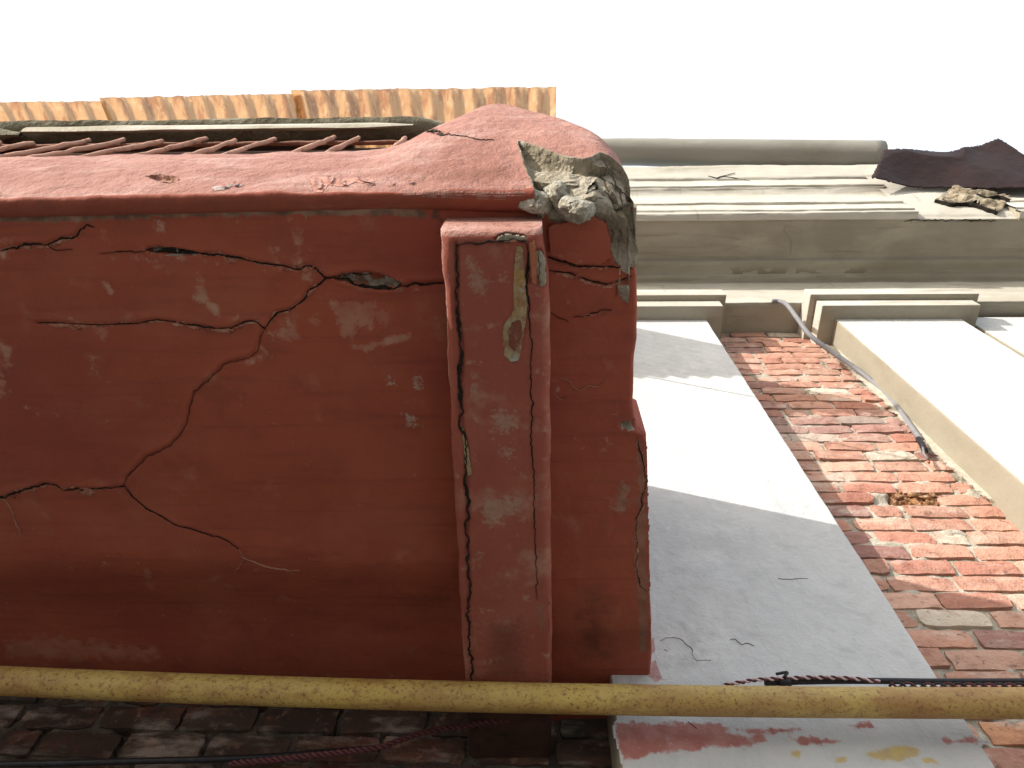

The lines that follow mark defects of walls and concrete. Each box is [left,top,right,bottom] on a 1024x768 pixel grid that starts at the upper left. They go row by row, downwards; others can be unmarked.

crack [426,129,494,141]
crack [1,224,94,251]
spalling [457,149,639,363]
crack [0,251,333,574]
crack [525,250,632,594]
crack [399,244,474,681]
crack [633,438,648,592]
spalling [887,491,941,506]
peeling [612,719,878,765]
peeling [863,741,942,766]
peeling [938,734,990,748]